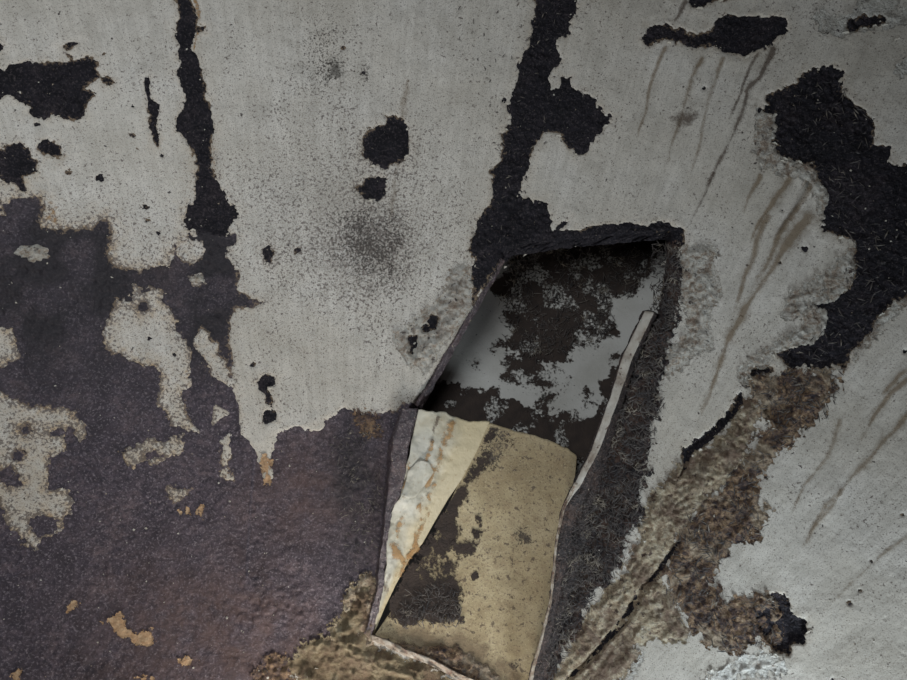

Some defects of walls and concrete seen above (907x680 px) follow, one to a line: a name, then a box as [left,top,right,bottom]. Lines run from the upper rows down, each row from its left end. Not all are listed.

peeling [751,107,829,223]
peeling [391,262,474,375]
peeling [736,236,856,387]
peeling [850,297,907,363]
peeling [350,404,386,440]
peeling [401,460,434,498]